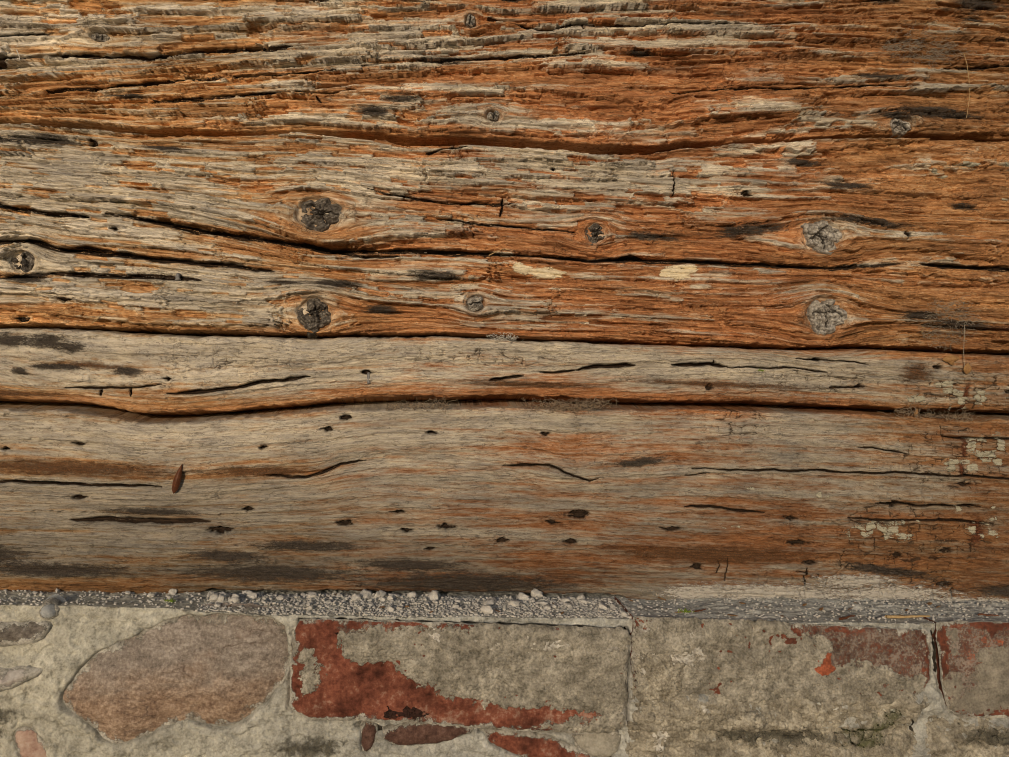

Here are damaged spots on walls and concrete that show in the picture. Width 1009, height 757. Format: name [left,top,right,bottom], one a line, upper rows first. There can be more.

crack [65,351,310,397]
crack [268,459,366,478]
crack [503,463,599,481]
crack [684,373,1009,598]
spalling [296,648,328,697]
spalling [337,617,1009,757]